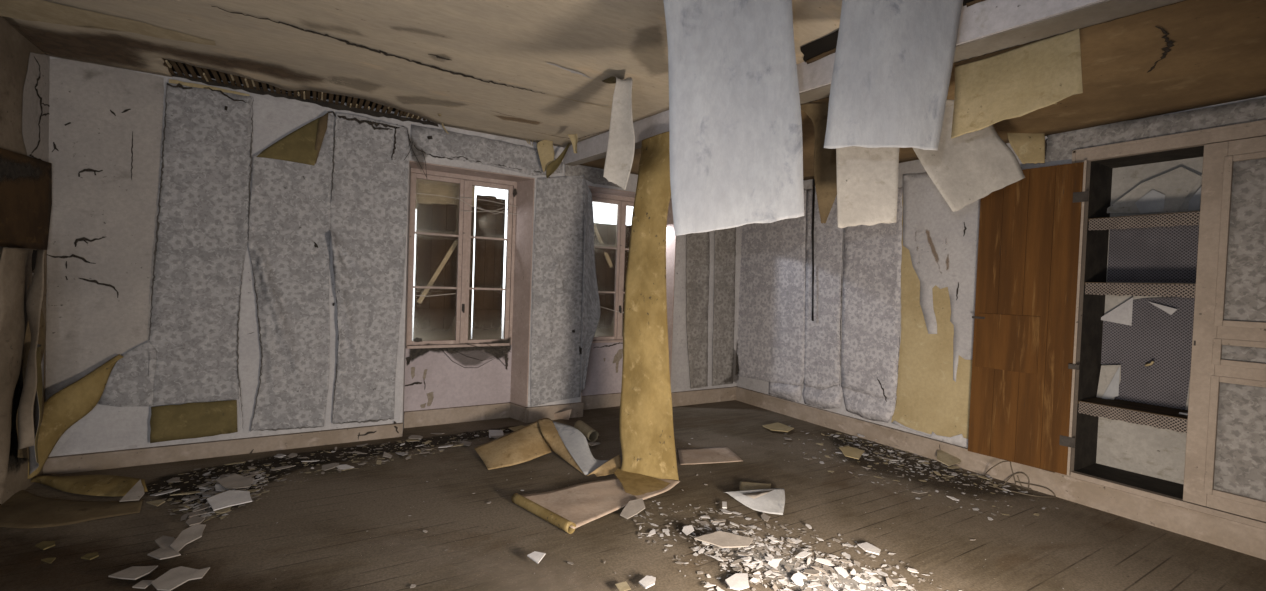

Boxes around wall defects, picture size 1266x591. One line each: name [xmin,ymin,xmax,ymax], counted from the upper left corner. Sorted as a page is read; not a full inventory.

crack [212,6,609,139]
crack [953,0,1186,73]
crack [128,132,136,180]
crack [47,254,96,280]
peeling [22,52,439,479]
peeling [891,194,972,439]